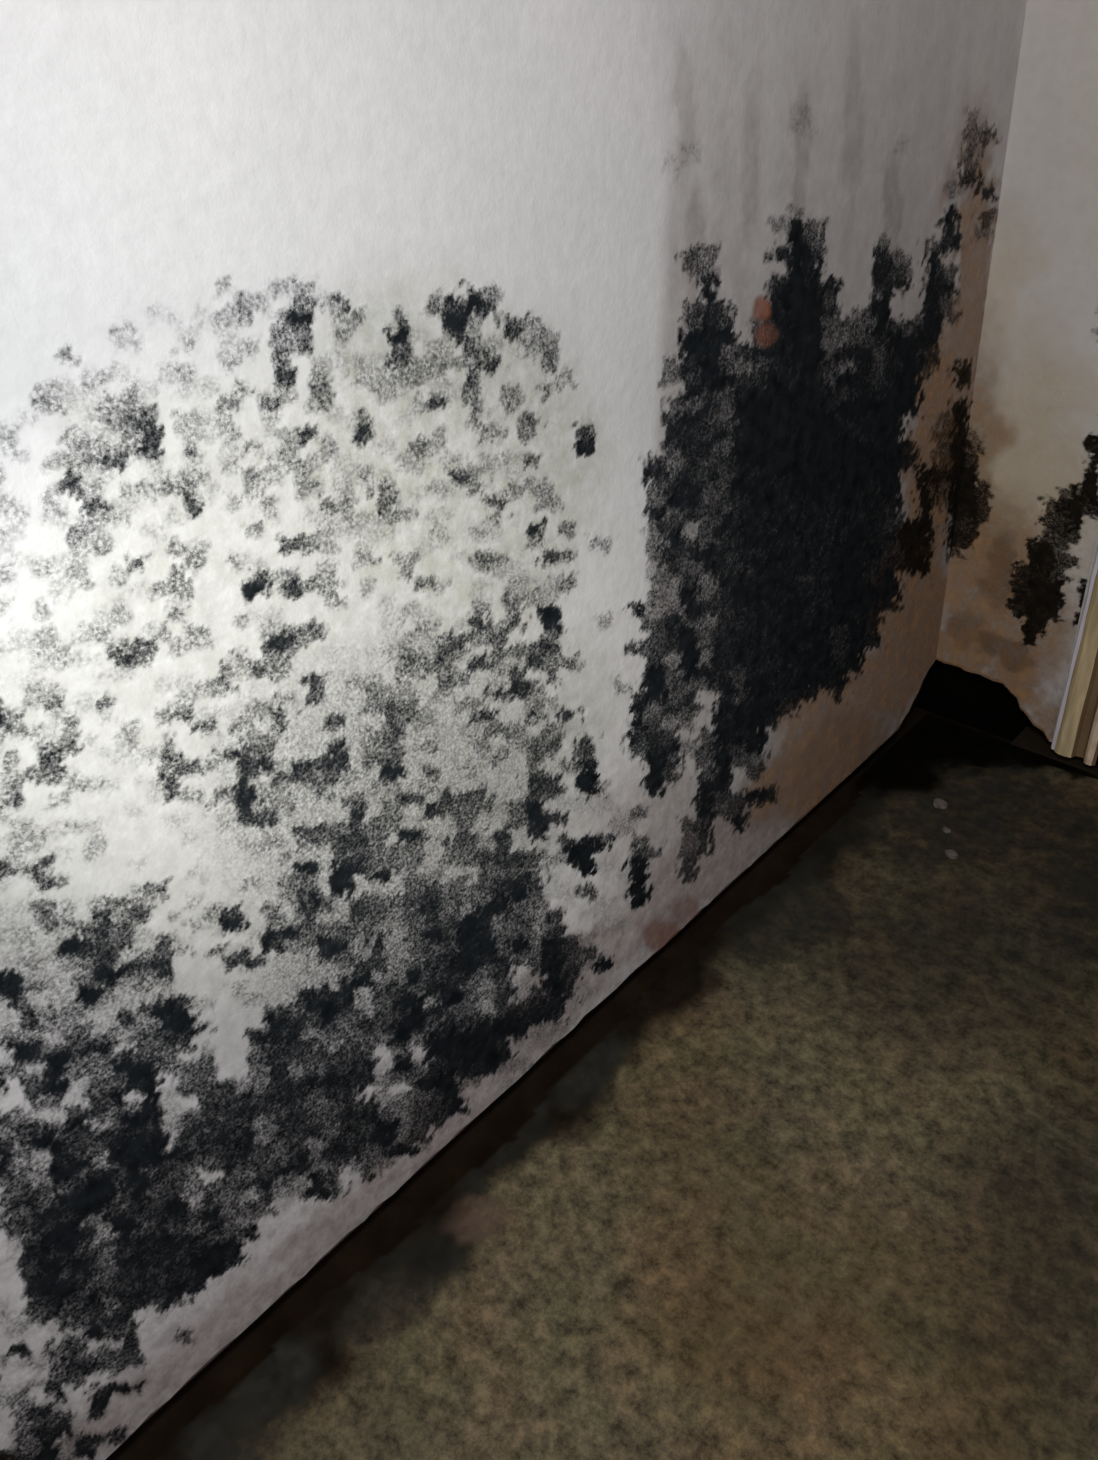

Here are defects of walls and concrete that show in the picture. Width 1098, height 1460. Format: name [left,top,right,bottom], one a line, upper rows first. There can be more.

leakage [0,280,662,1460]
leakage [153,112,1098,1460]
flaking render [899,658,1050,742]